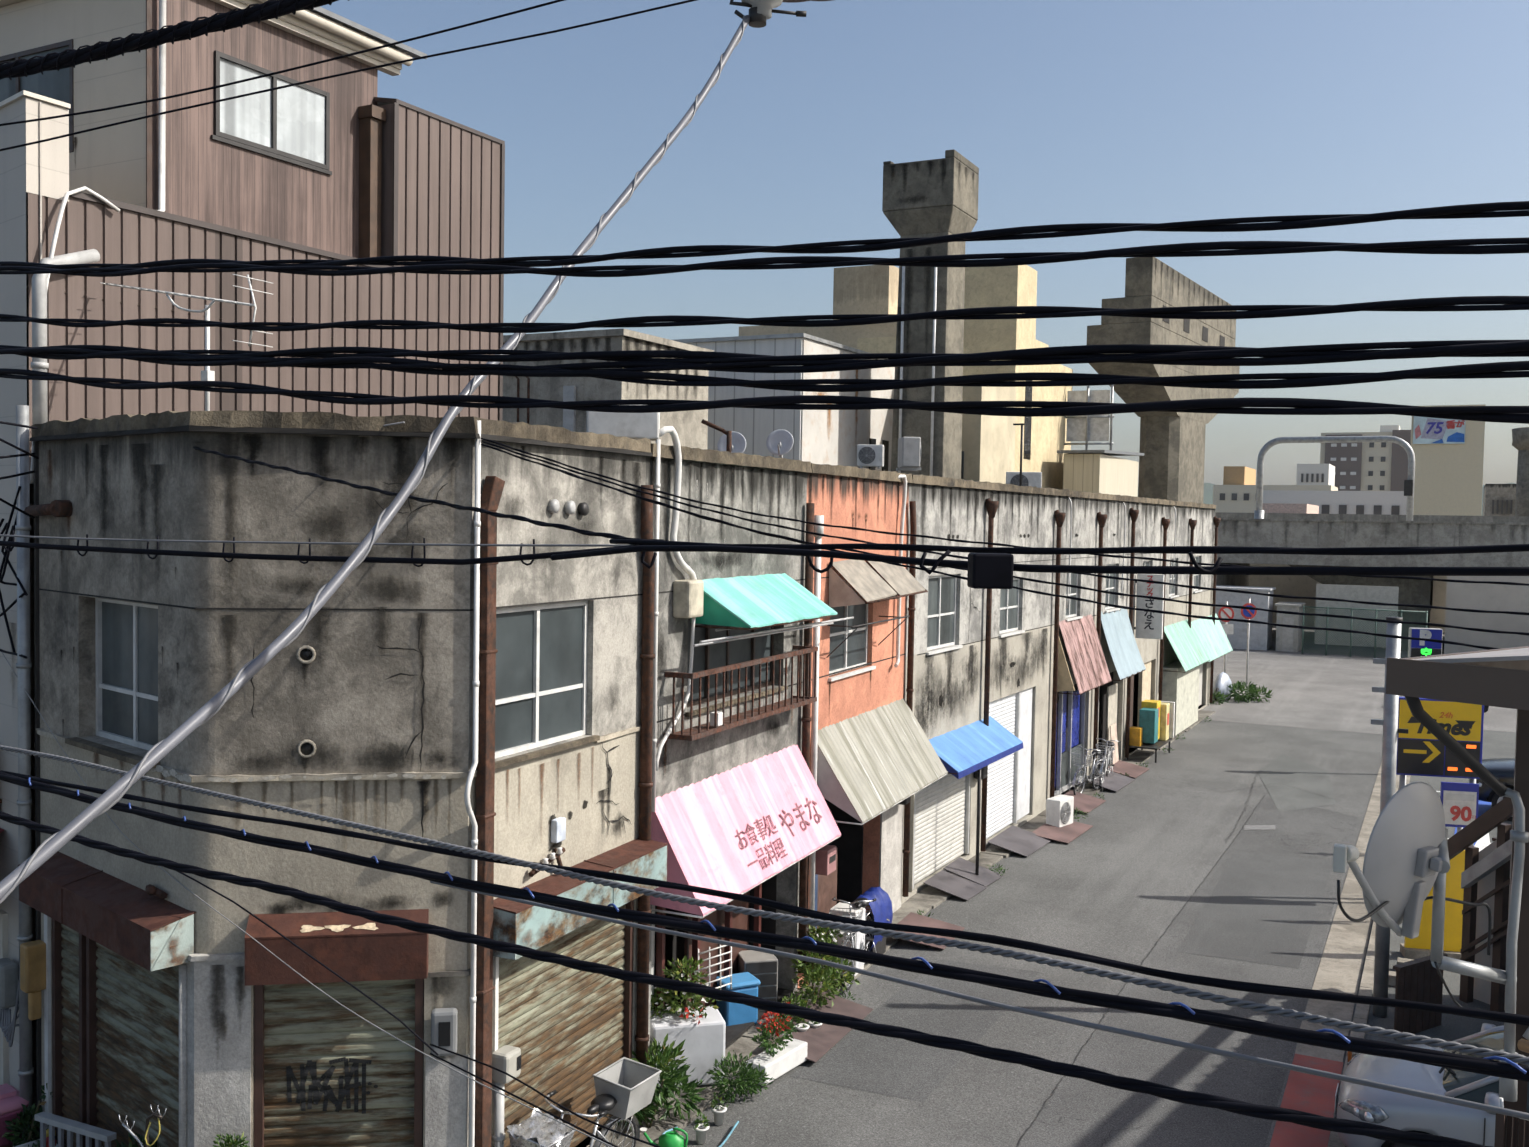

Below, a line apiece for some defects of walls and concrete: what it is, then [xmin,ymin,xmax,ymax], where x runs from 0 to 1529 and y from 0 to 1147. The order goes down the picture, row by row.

damp [132,443,161,525]
damp [221,433,260,539]
damp [222,615,236,669]
damp [313,607,328,638]
damp [371,578,427,685]
crack [376,614,425,837]
damp [918,645,978,729]
damp [995,628,1047,684]
damp [234,757,277,802]
damp [291,745,451,828]
crack [597,745,632,834]
damp [211,965,244,1036]